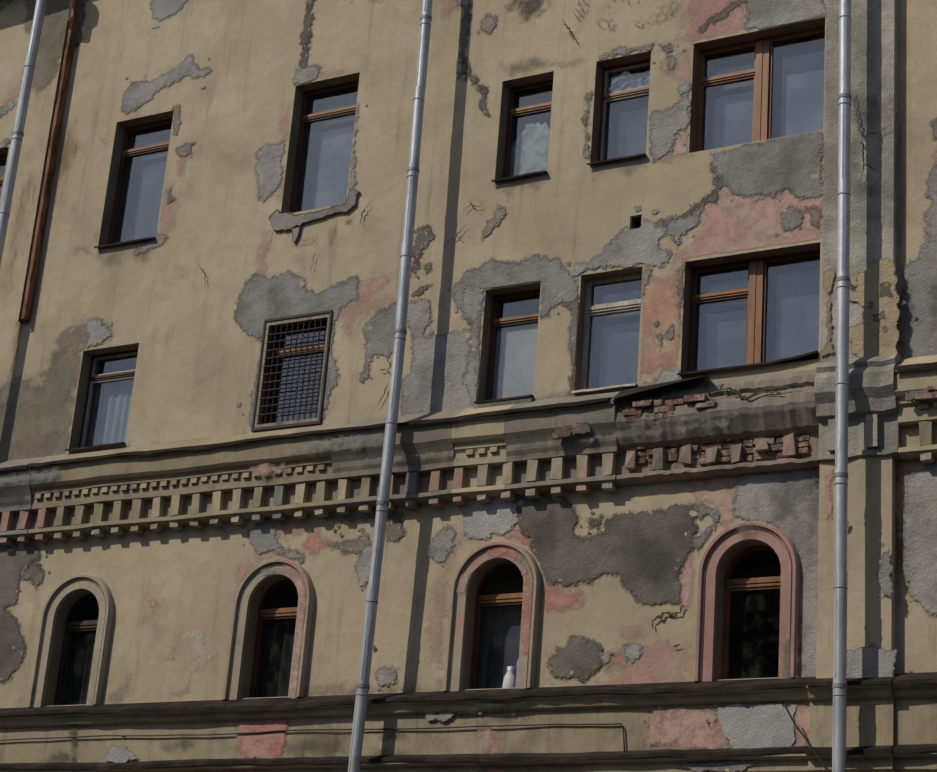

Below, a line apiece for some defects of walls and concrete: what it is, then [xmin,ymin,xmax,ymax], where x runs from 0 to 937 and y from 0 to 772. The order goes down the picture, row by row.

flaking render [455,0,497,117]
crack [562,0,680,45]
flaking render [697,0,826,33]
flaking render [233,103,367,426]
flaking render [399,131,824,416]
flaking render [0,539,50,684]
flaking render [237,507,376,698]
peeling [546,635,693,685]
flaking render [428,467,820,677]
crack [652,605,685,628]
flaking render [644,702,810,750]
flaking render [876,459,937,616]